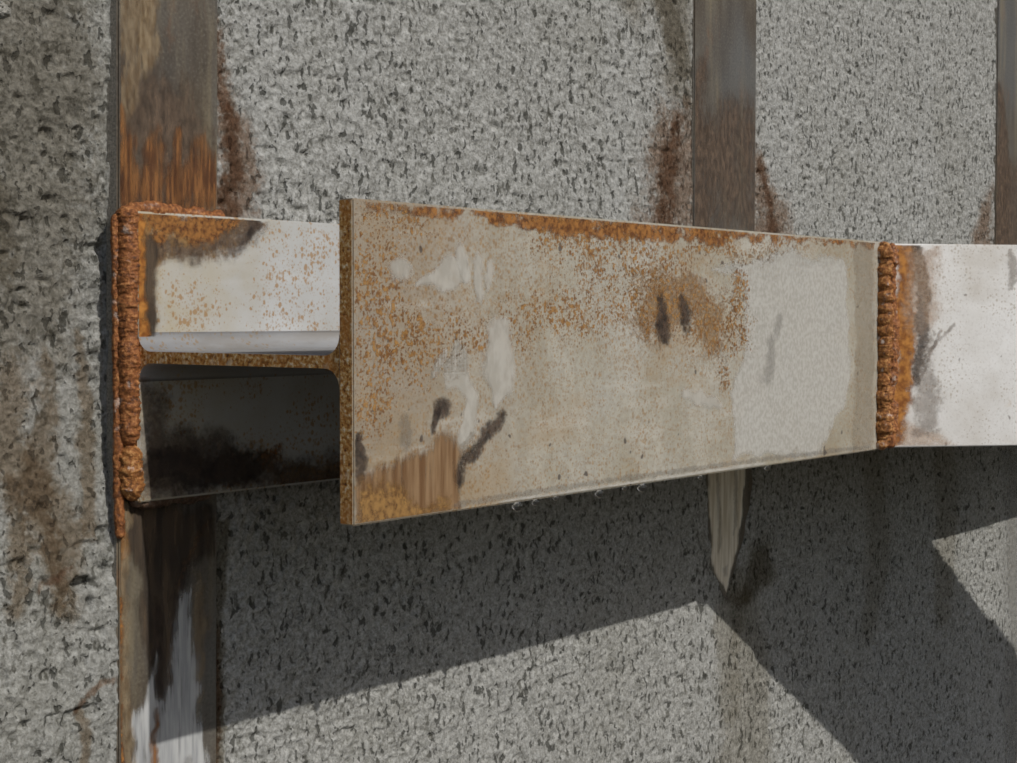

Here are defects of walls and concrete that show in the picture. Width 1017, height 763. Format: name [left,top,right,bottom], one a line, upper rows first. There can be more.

spalling [0,1,12,19]
corrosion [120,69,264,337]
corrosion [355,202,875,448]
corrosion [142,386,340,499]
corrosion [357,433,461,523]